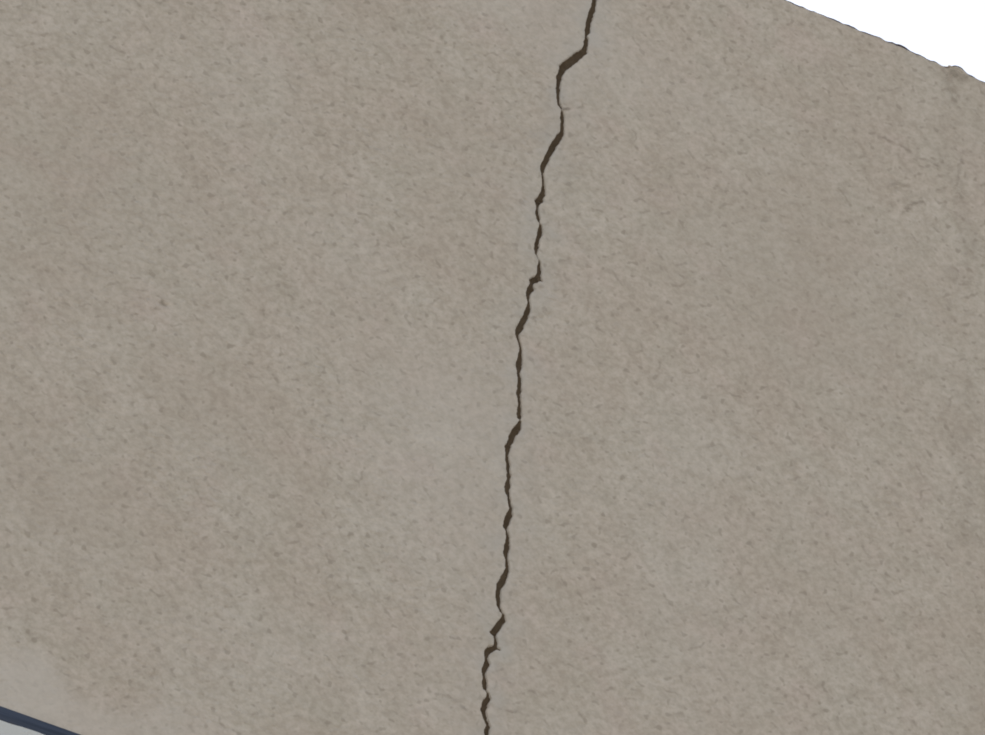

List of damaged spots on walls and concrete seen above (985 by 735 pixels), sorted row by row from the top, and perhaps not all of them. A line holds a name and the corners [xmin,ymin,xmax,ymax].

crack [480,0,596,735]